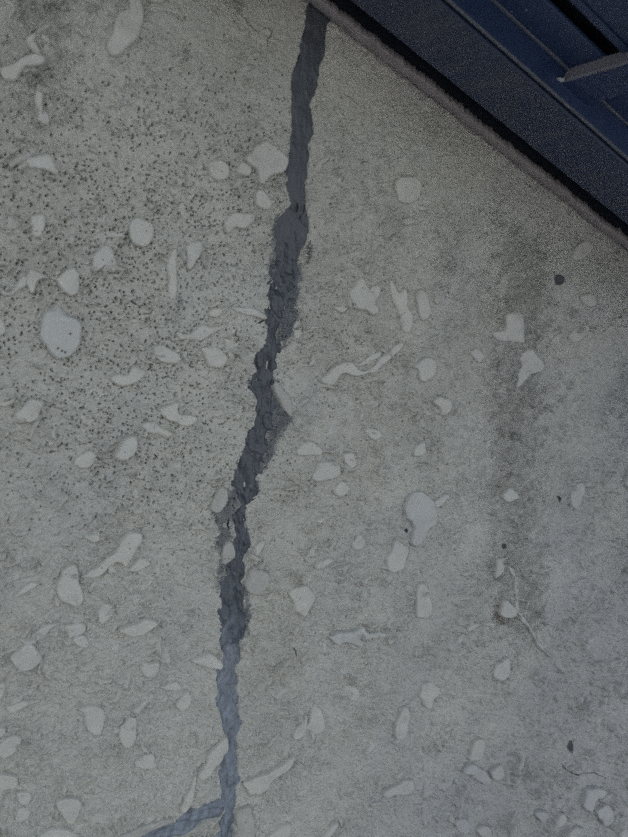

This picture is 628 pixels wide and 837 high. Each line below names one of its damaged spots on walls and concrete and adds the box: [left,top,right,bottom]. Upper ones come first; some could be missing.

crack [141,3,331,837]